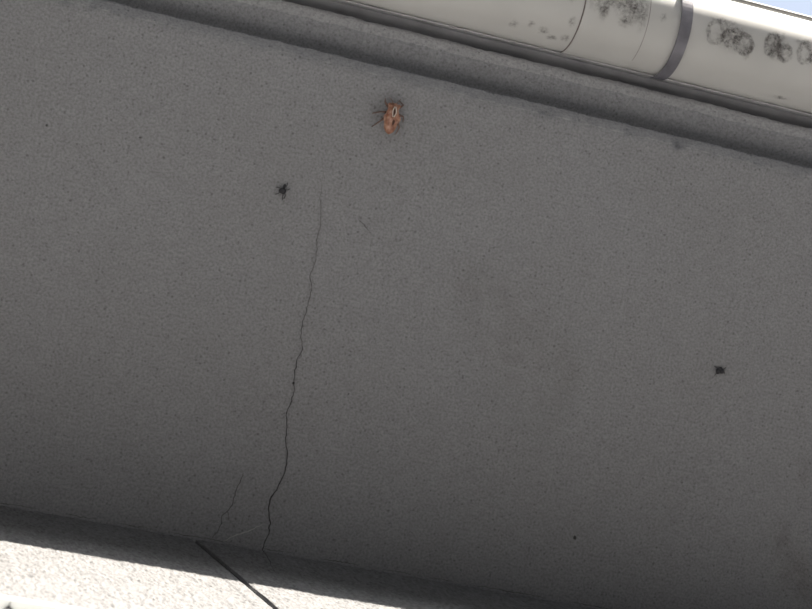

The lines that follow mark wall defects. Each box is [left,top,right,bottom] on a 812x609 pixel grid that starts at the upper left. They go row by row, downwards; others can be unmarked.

crack [262,161,324,574]